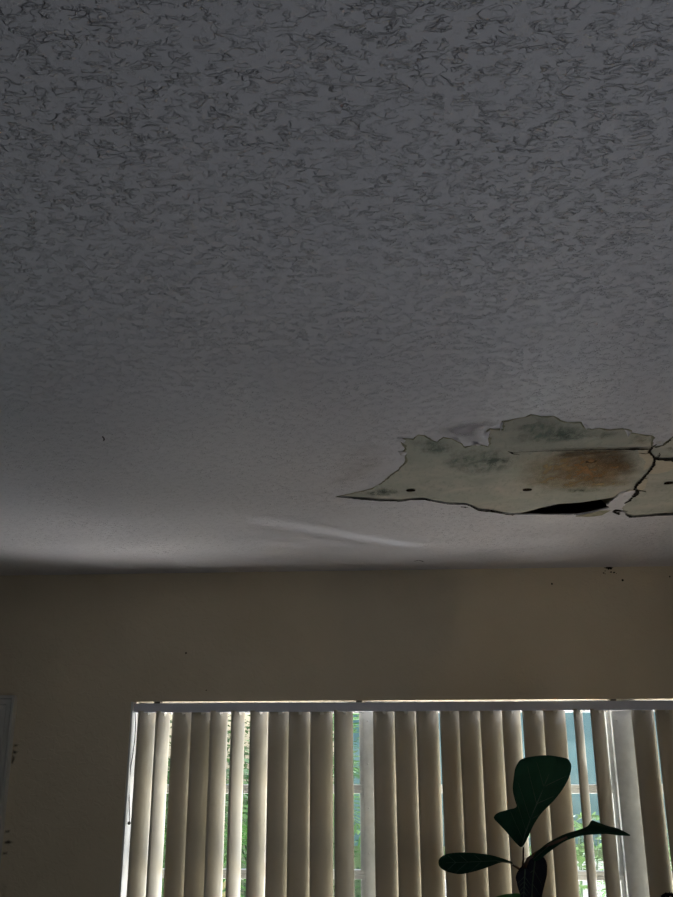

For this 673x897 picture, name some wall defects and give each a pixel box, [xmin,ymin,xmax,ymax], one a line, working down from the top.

peeling [336,414,673,517]
crack [565,438,673,518]